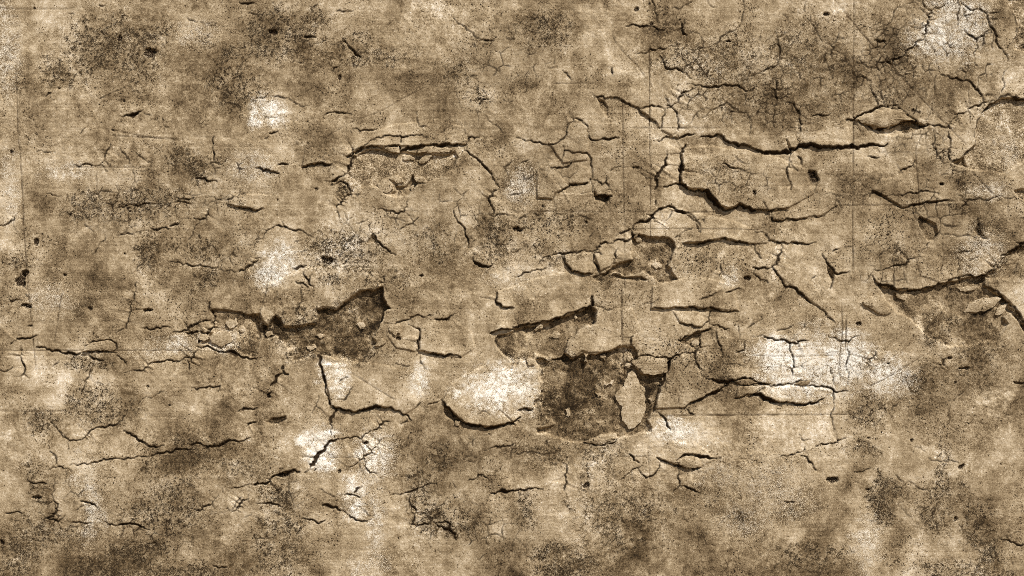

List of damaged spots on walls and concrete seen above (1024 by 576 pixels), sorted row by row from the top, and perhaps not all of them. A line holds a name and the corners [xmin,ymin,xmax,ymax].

crack [259,96,538,219]
crack [453,211,491,268]
crack [490,0,1024,471]
crack [7,263,255,392]
crack [31,373,289,543]
spalling [199,287,401,370]
crack [194,354,410,524]
spalling [443,407,460,426]
spalling [495,307,670,441]
crack [591,441,712,492]
spalling [878,246,1024,370]